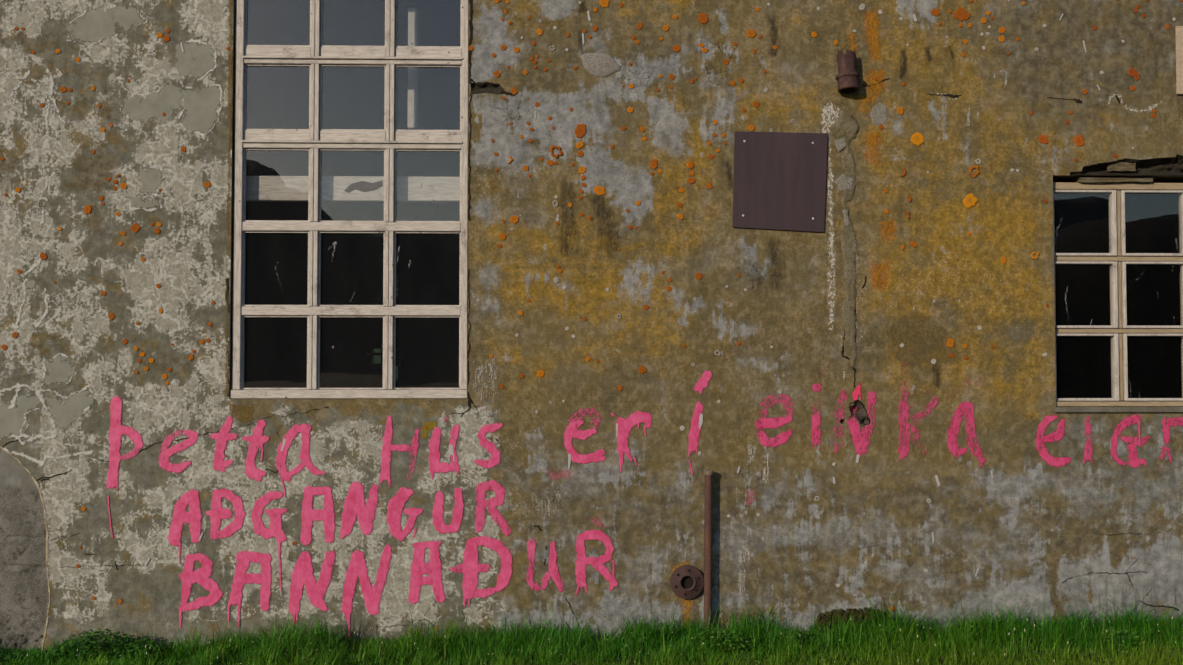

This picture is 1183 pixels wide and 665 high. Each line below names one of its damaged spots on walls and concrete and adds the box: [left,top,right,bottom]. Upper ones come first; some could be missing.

peeling [67,4,147,45]
peeling [9,68,65,129]
peeling [120,39,223,140]
peeling [124,159,165,212]
leakage [821,103,843,345]
peeling [12,257,50,329]
crack [841,276,869,421]